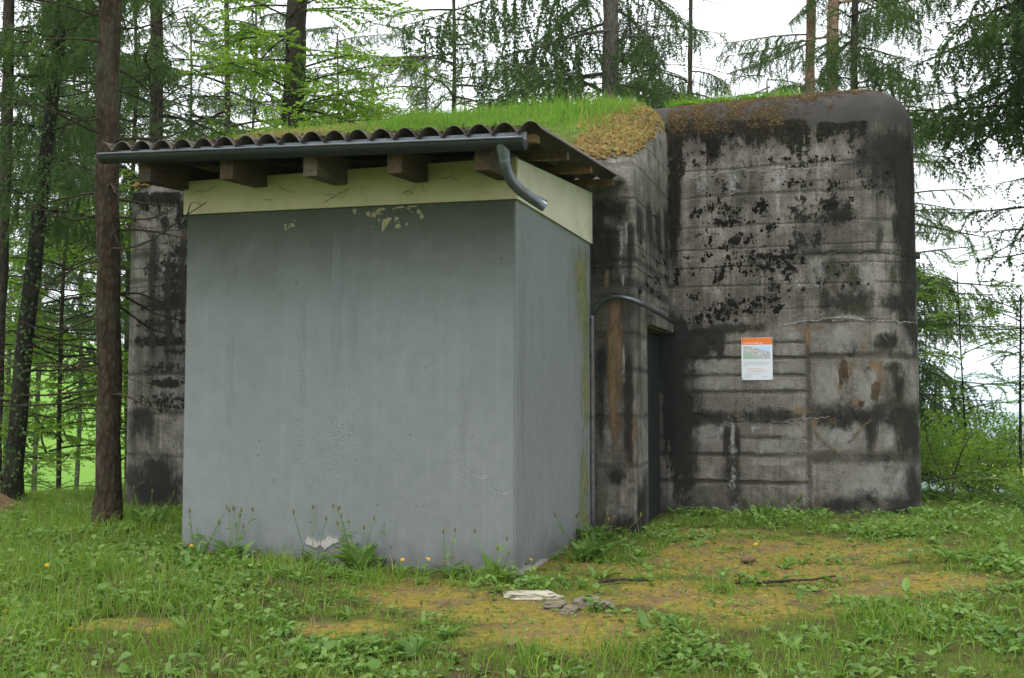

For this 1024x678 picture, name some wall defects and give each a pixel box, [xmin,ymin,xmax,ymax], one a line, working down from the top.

peeling [352,204,424,232]
damp [573,141,686,439]
crack [780,316,918,339]
damp [795,130,921,514]
rust [607,299,635,459]
rust [838,358,882,408]
damp [129,408,153,438]
damp [609,345,633,484]
damp [653,314,801,512]
crack [698,413,829,425]
damp [126,457,182,509]
peeling [304,534,341,550]